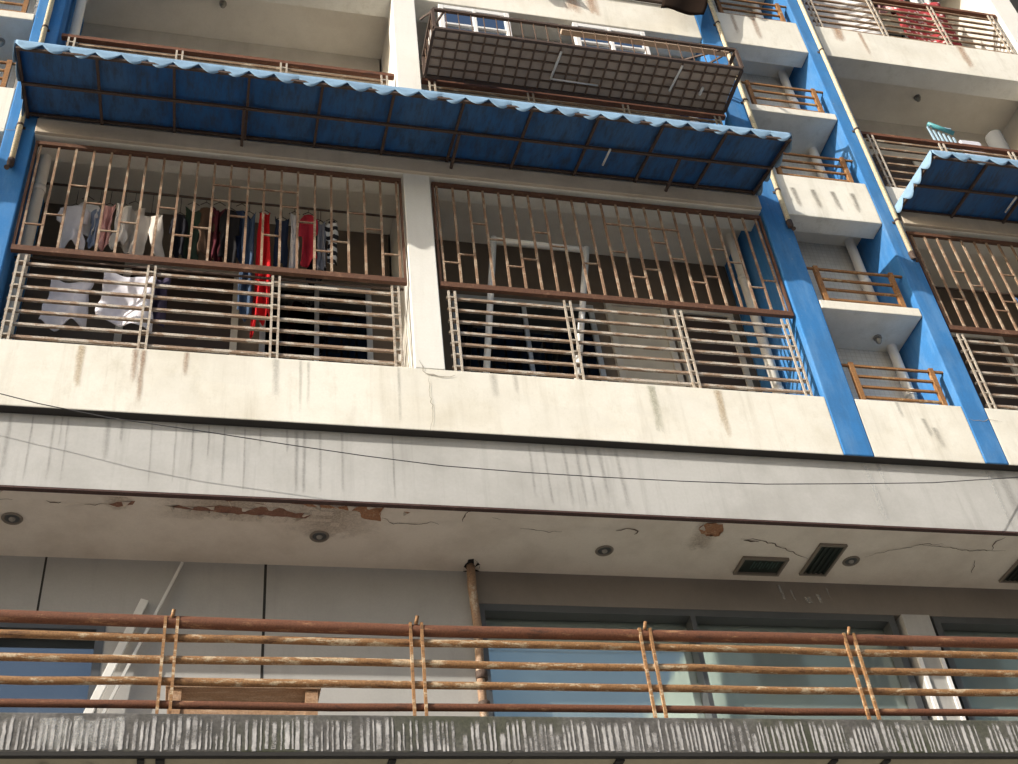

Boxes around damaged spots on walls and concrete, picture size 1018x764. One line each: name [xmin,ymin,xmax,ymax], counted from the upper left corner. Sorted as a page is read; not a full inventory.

crack [419,360,455,431]
peeling [166,501,384,522]
crack [745,538,803,557]
crack [870,538,1006,572]